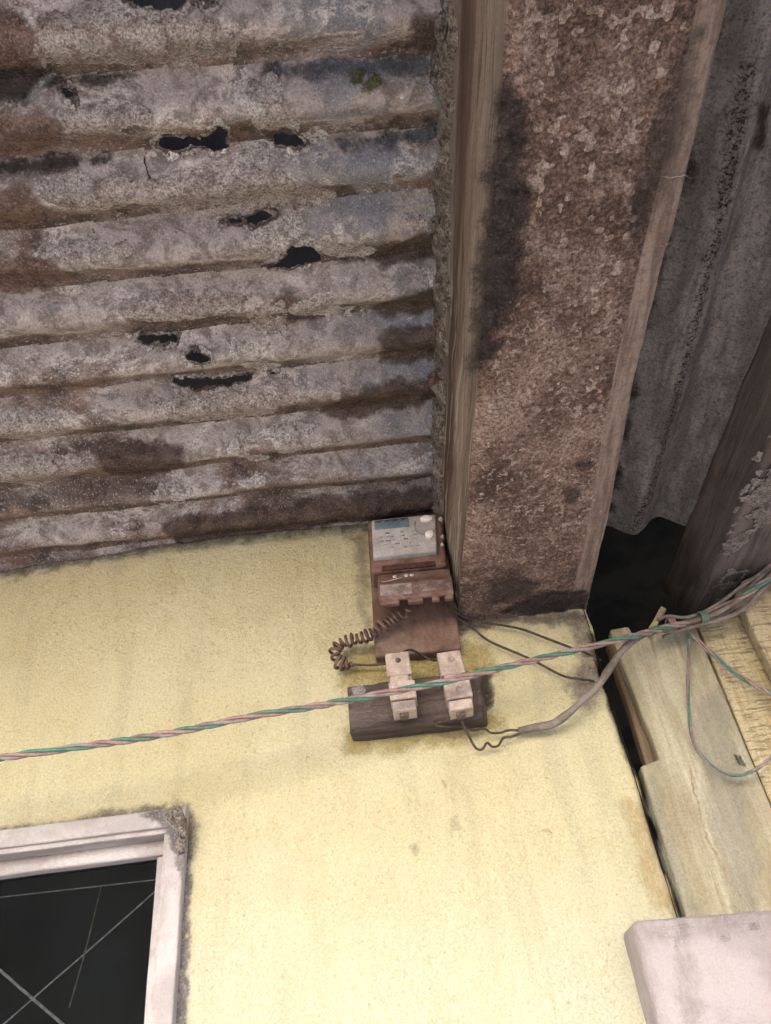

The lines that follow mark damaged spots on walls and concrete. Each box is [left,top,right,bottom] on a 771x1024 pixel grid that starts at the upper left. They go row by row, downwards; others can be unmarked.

corrosion [229,124,251,143]
leakage [753,104,770,150]
leakage [466,77,532,373]
peeling [708,451,771,602]
leakage [341,573,647,815]